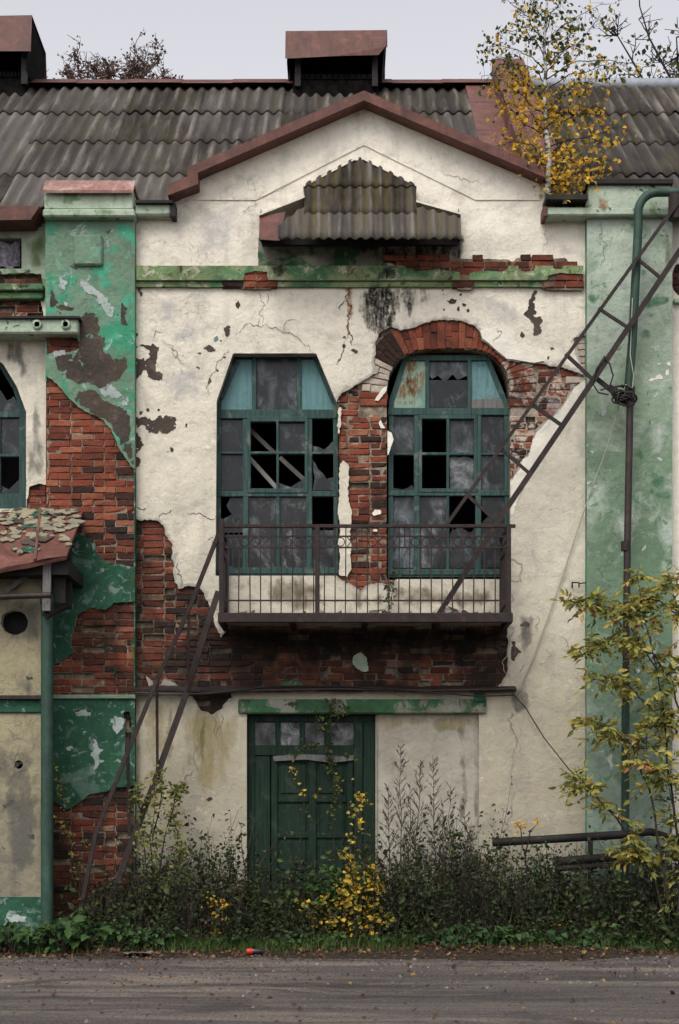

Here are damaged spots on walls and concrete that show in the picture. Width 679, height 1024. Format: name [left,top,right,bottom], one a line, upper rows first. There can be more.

damp [353,238,464,331]
crack [206,293,353,394]
flaking render [337,254,585,590]
flaking render [0,271,521,714]
peeling [83,731,104,770]
peeling [109,716,126,734]